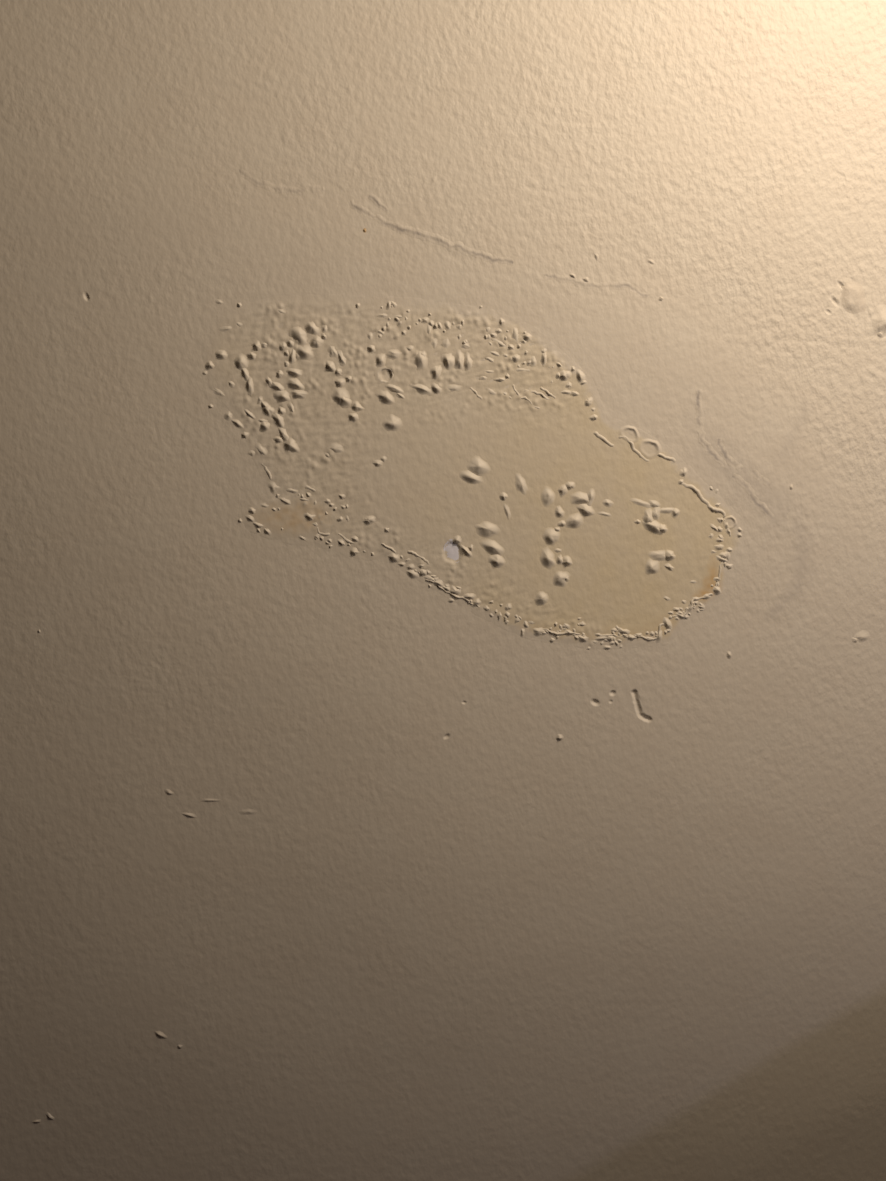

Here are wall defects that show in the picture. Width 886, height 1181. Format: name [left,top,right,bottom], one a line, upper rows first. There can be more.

crack [238,167,514,266]